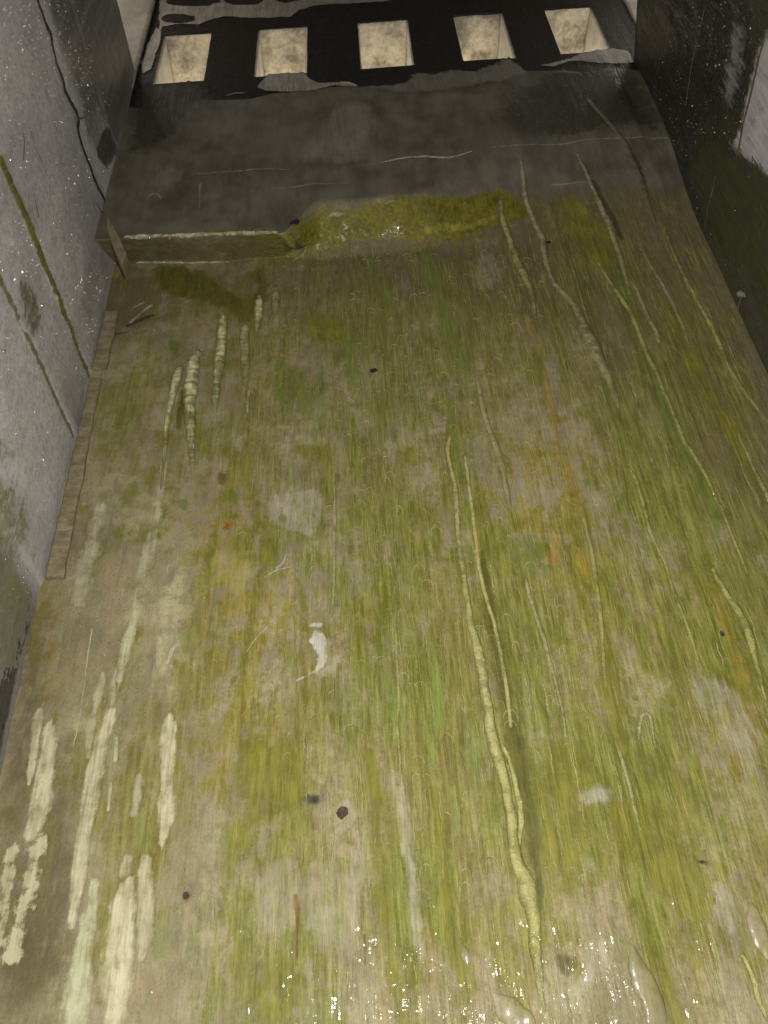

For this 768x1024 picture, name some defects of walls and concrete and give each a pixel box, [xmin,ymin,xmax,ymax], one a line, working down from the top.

crack [36,0,105,202]
crack [191,136,667,189]
water stain [174,389,184,430]
water stain [0,707,61,967]
water stain [58,461,180,1024]